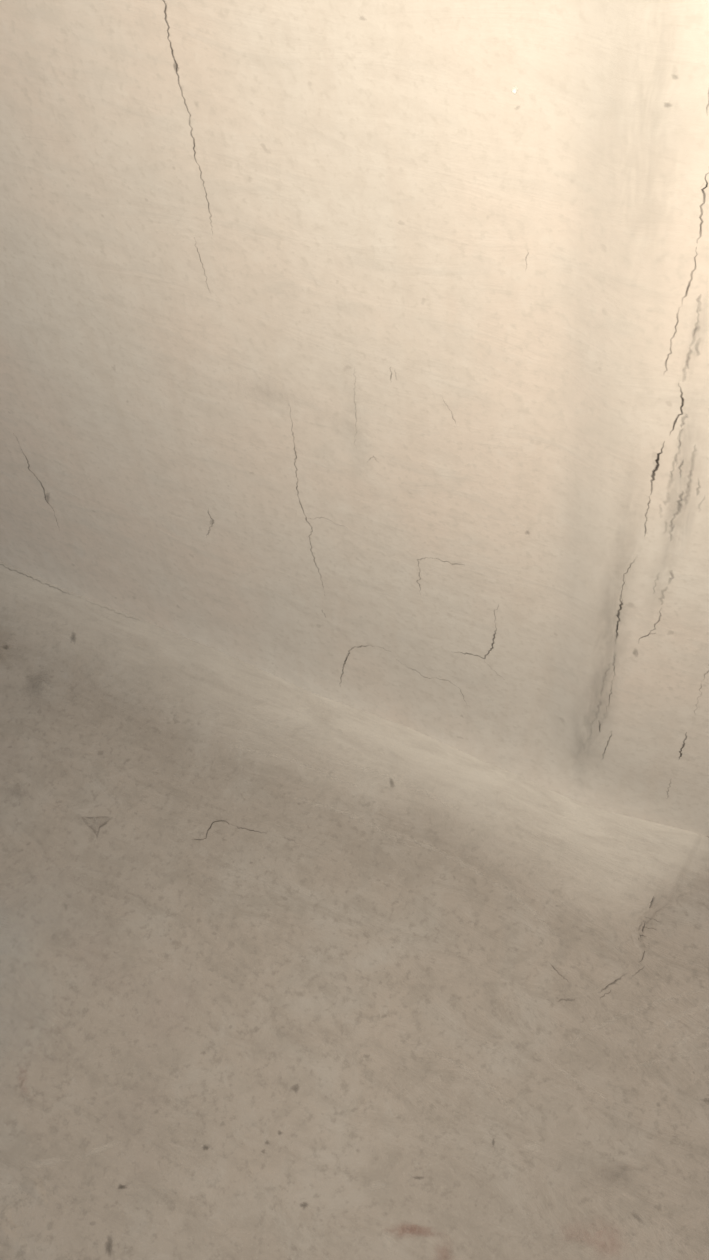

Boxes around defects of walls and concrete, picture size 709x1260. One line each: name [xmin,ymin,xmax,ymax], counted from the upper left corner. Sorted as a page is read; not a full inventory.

crack [652,394,684,480]